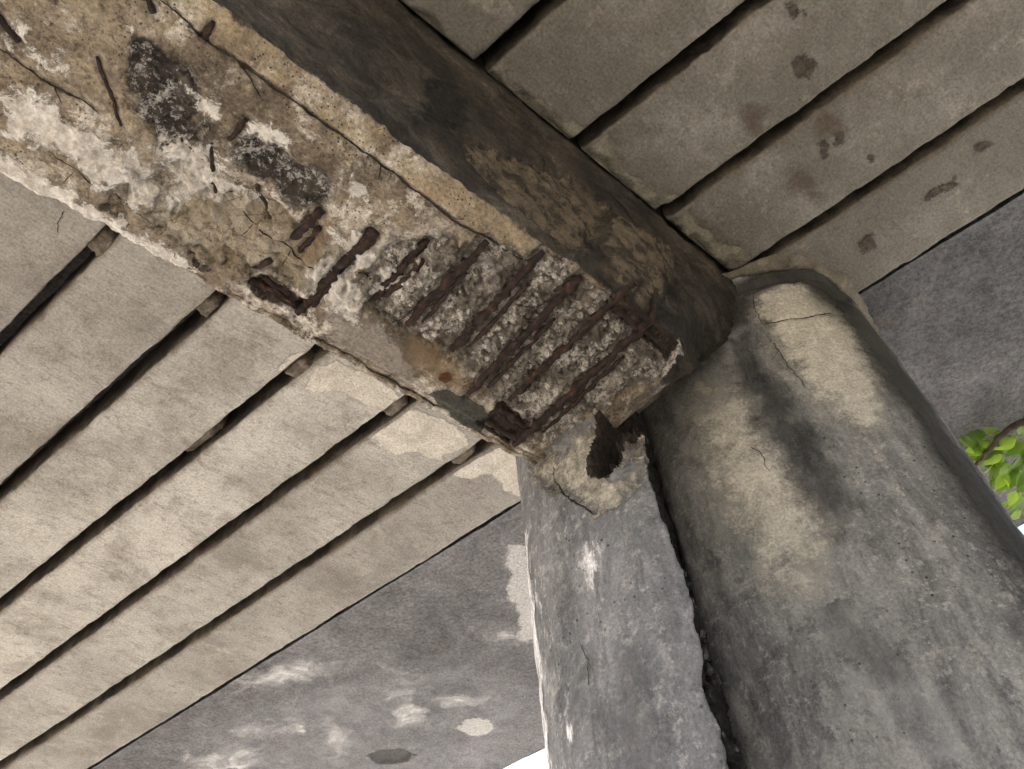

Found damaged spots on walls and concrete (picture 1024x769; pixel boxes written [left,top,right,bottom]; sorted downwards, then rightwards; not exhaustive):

water stain [0,15,74,77]
crack [0,49,101,116]
water stain [791,55,818,80]
water stain [246,119,292,150]
crack [156,0,549,278]
water stain [0,80,261,273]
water stain [349,173,369,205]
water stain [292,226,414,380]
spalling [95,34,684,519]
crack [753,298,832,385]
rust [439,372,452,383]
crack [551,466,595,515]